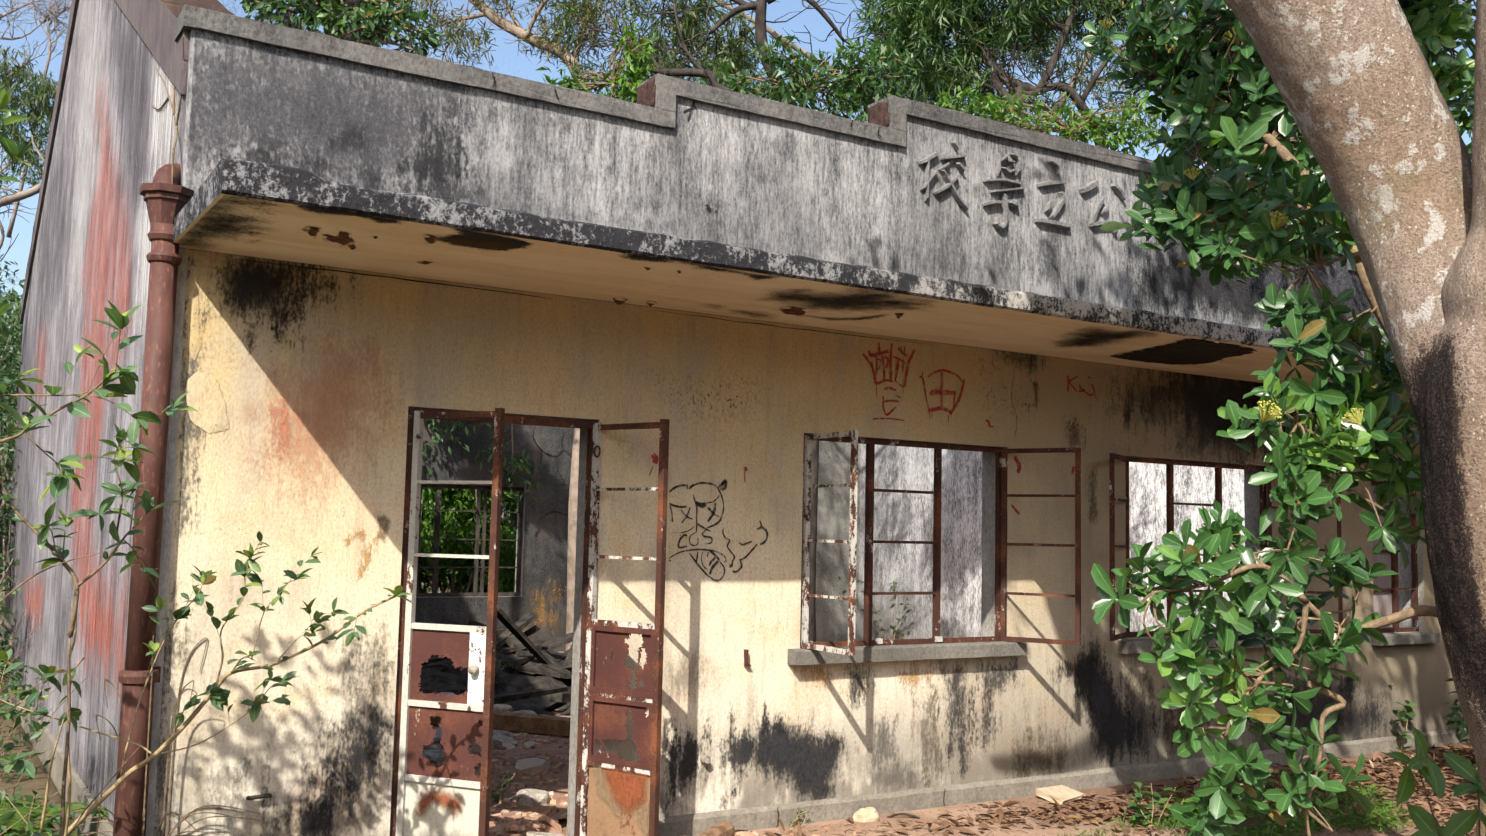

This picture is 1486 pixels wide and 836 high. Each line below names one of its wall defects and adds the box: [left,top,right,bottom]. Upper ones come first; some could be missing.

damp [108,1,483,321]
spalling [302,227,356,250]
damp [439,228,531,251]
damp [620,253,921,320]
spalling [779,306,808,317]
peeling [1111,339,1258,366]
rust [73,310,122,648]
rust [347,515,389,577]
damp [300,663,392,836]
damp [662,702,844,816]
damp [902,656,1018,773]
damp [1066,645,1204,763]